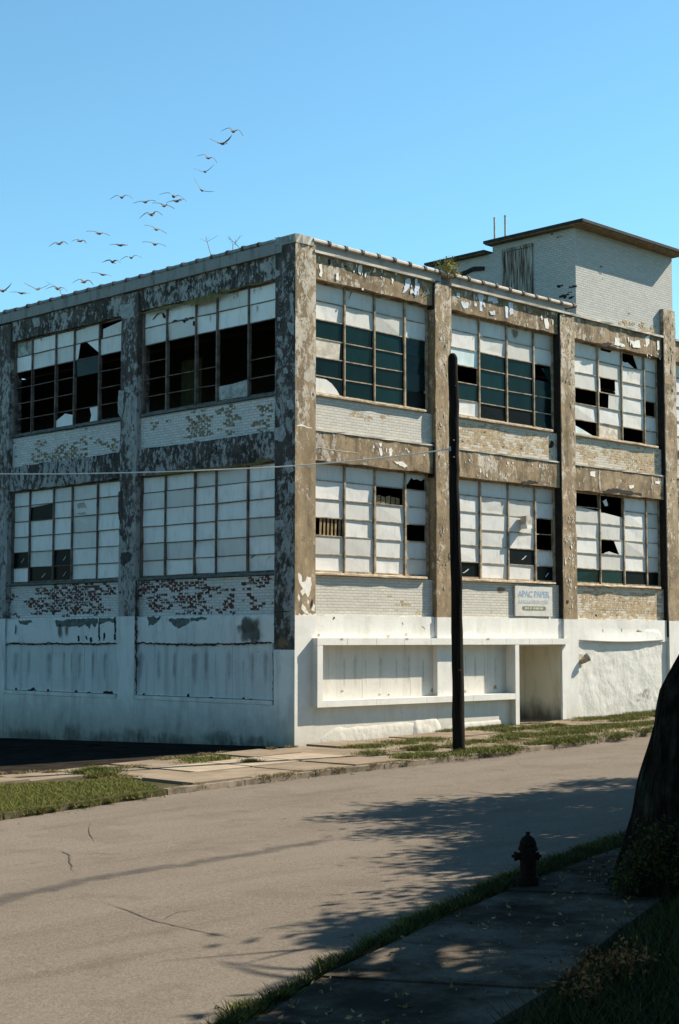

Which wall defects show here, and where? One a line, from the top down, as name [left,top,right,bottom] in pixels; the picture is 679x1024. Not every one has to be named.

peeling [119,303,134,319]
peeling [457,293,515,322]
flaking render [183,251,426,540]
flaking render [14,385,134,466]
flaking render [459,422,554,479]
peeling [118,482,133,570]
flaking render [10,583,121,642]
peeling [139,575,273,629]
water stain [238,618,259,642]
peeling [298,573,315,614]
flaking render [565,536,673,620]